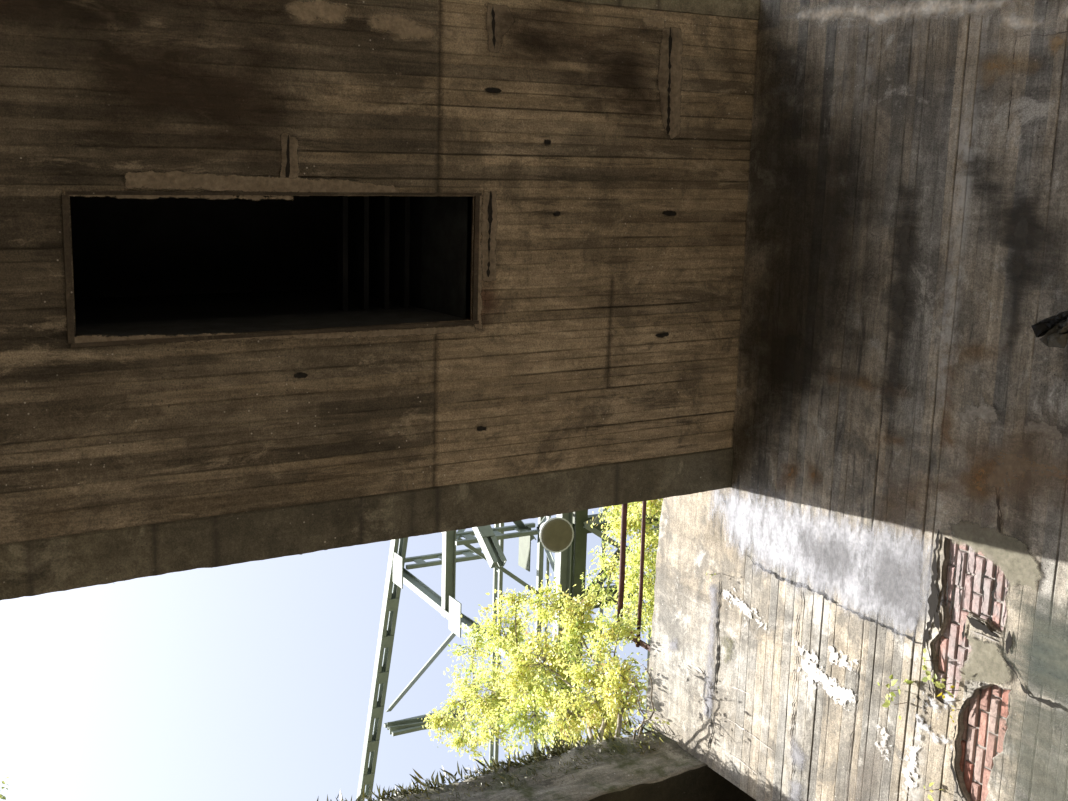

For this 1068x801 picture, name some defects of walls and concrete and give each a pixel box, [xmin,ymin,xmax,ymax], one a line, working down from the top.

crack [1005,31,1068,187]
crack [708,582,720,749]
crack [738,541,920,799]
spalling [875,529,1012,801]
crack [1004,659,1068,712]